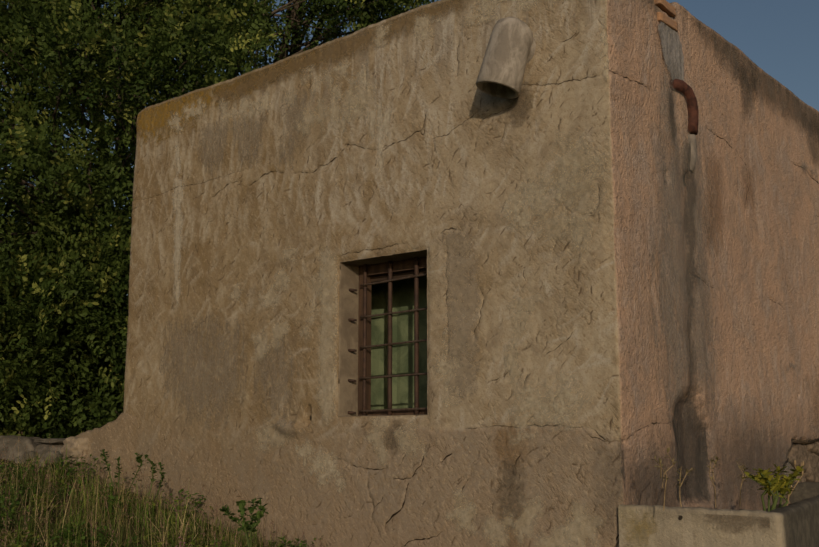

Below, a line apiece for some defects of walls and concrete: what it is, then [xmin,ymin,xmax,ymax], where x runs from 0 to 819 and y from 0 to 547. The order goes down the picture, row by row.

crack [466,397,669,442]
spalling [780,439,819,483]
crack [333,448,452,532]